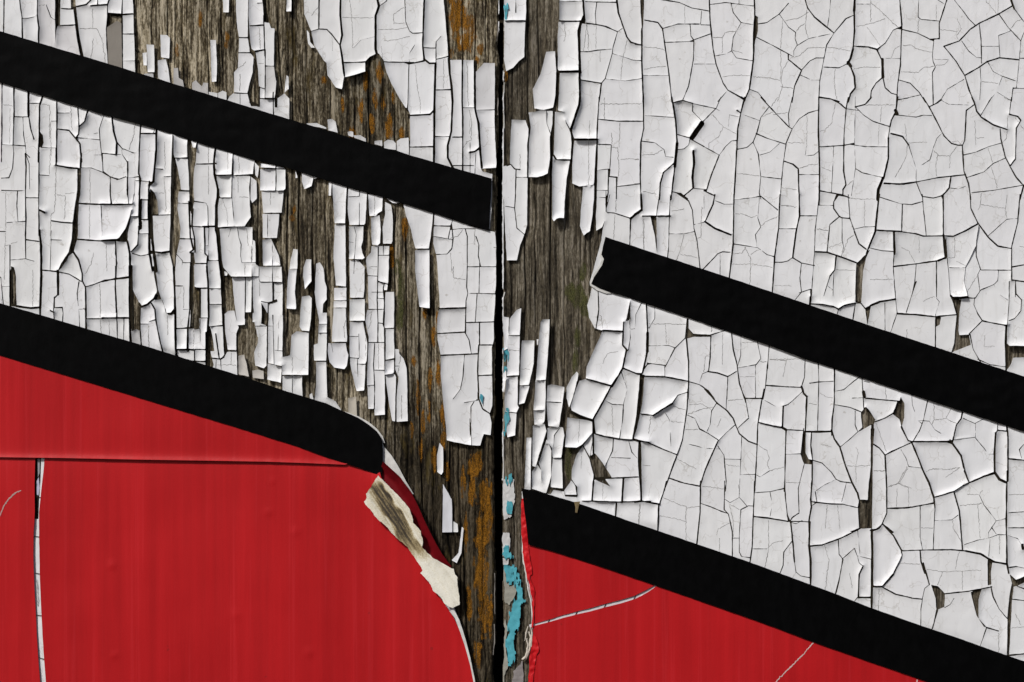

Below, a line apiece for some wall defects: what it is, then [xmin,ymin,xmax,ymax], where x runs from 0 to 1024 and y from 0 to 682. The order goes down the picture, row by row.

peeling [55,0,76,37]
peeling [108,0,259,106]
peeling [58,167,82,270]
peeling [118,214,142,242]
crack [0,0,1024,474]
peeling [132,291,140,330]
peeling [151,0,611,682]
crack [502,287,1024,661]